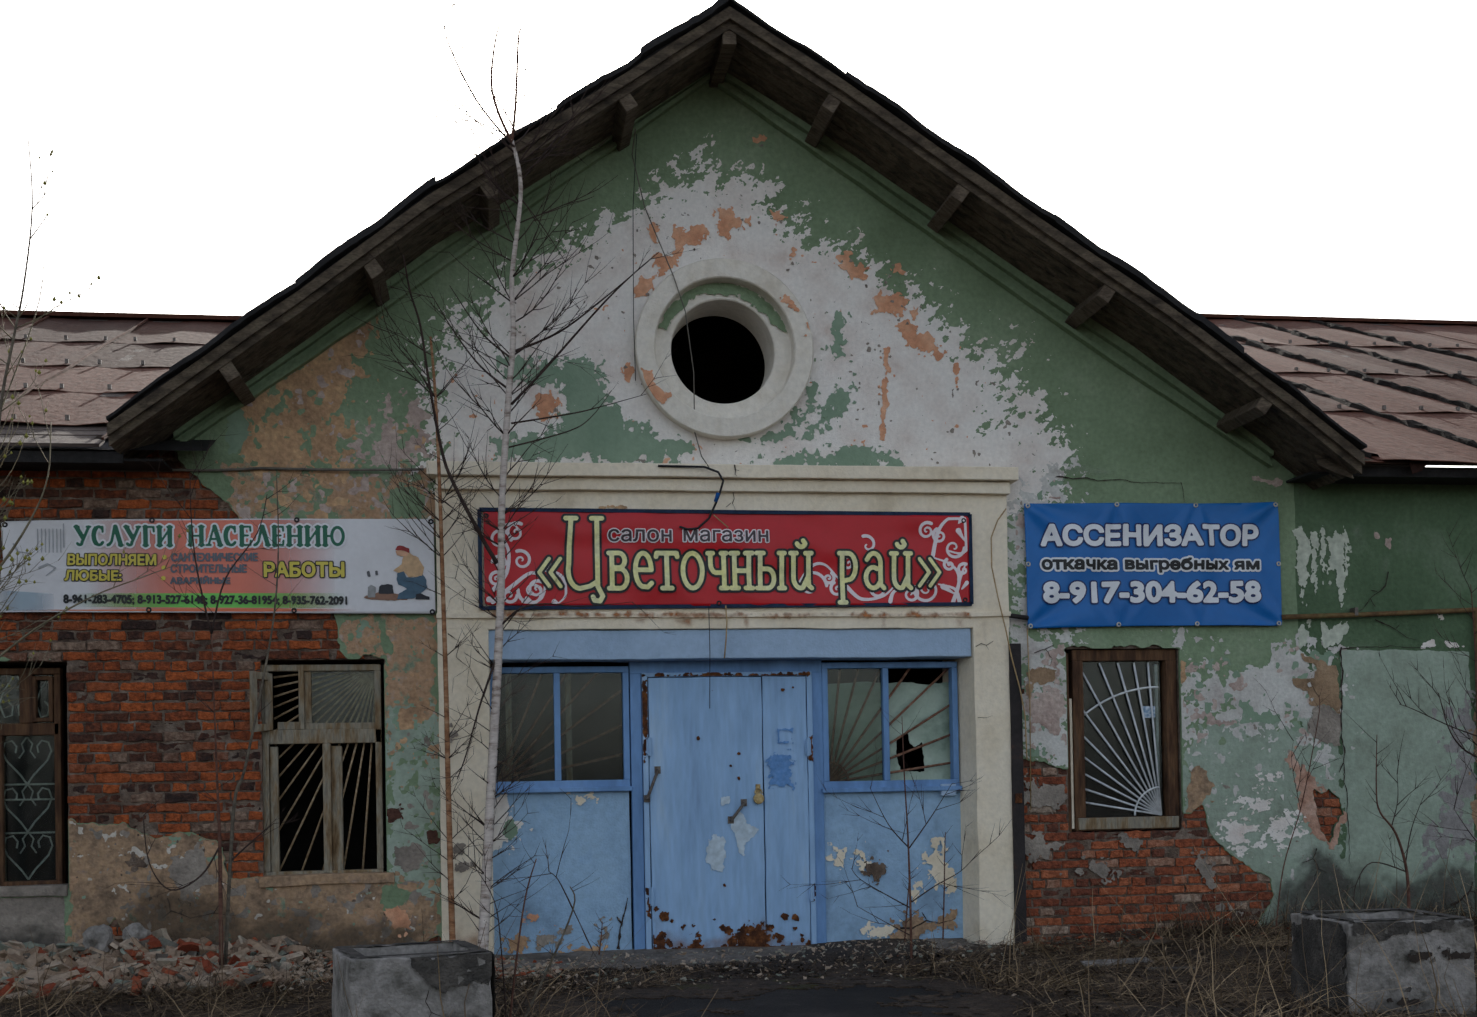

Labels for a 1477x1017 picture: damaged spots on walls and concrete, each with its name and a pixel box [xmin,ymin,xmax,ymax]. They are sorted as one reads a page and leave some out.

peeling [211,133,1089,778]
peeling [65,613,620,1017]
corrosion [645,888,811,949]
peeling [825,841,889,885]
peeling [860,837,958,939]
peeling [1161,626,1477,1014]